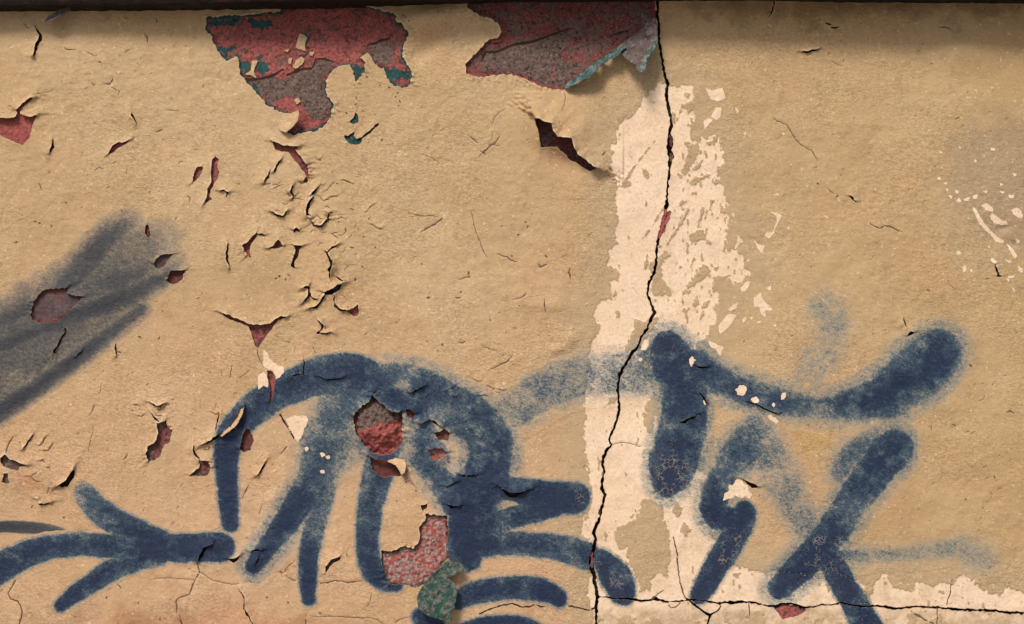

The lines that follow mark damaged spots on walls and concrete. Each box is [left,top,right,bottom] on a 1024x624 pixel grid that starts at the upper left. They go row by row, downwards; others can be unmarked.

peeling [465,1,658,90]
peeling [0,92,42,145]
peeling [205,7,412,183]
peeling [193,154,219,207]
peeling [528,81,789,361]
crack [470,3,1024,624]
peeling [141,417,173,465]
spalling [353,395,415,478]
spalling [735,385,759,403]
peeling [581,406,844,624]
peeling [381,504,464,623]
peeling [859,573,1024,624]